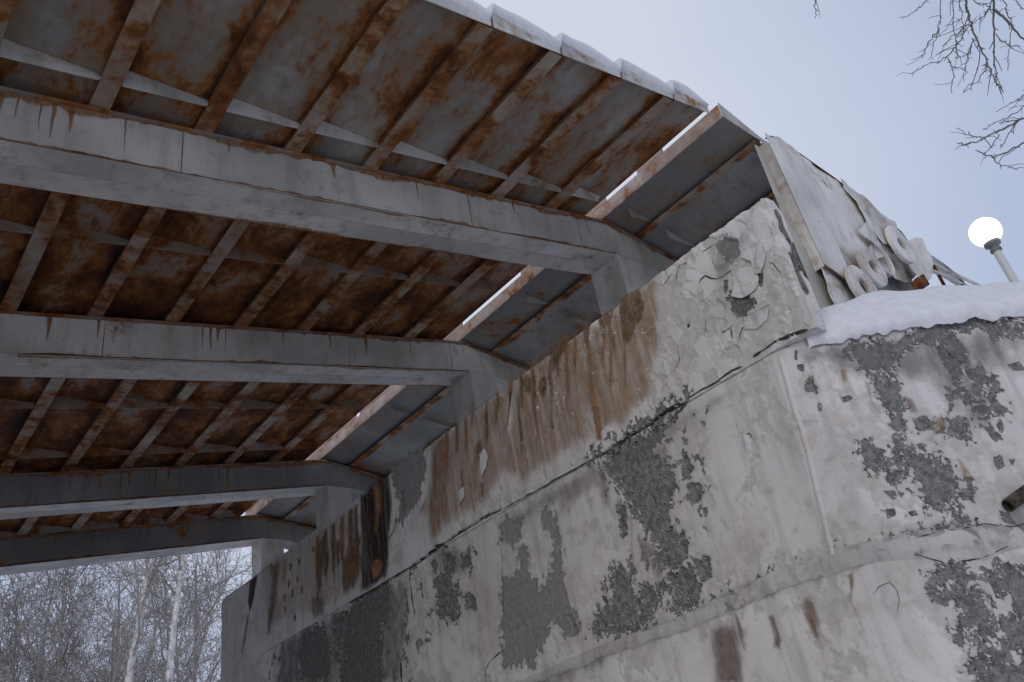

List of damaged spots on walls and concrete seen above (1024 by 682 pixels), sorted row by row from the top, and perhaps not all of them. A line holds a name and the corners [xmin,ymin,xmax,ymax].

rust [0,91,673,261]
rust [0,468,391,614]
rust [17,317,469,372]
rust [430,287,656,534]
crack [349,305,808,682]
spalling [496,385,733,671]
crack [664,245,731,284]
peeling [715,228,781,319]
crack [774,209,809,294]
spalling [843,316,1024,542]
crack [908,523,1024,575]
spalling [918,556,1024,682]